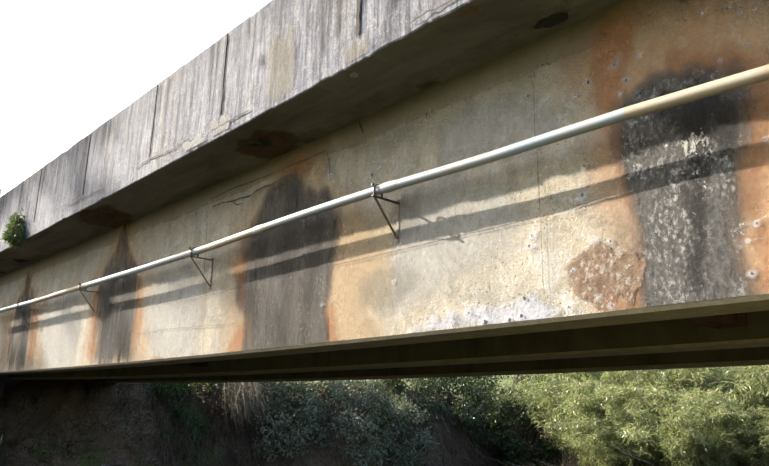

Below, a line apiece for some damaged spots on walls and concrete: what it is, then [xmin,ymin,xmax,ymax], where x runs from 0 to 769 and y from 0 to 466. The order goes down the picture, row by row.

corrosion [577,3,769,113]
leakage [622,61,741,108]
leakage [8,275,33,370]
corrosion [78,205,153,359]
leakage [96,224,199,364]
corrosion [230,217,259,351]
crack [211,150,331,207]
leakage [236,176,337,350]
corrosion [238,131,396,342]
spalling [567,239,647,309]
leakage [620,86,753,307]
corrosion [729,80,769,289]